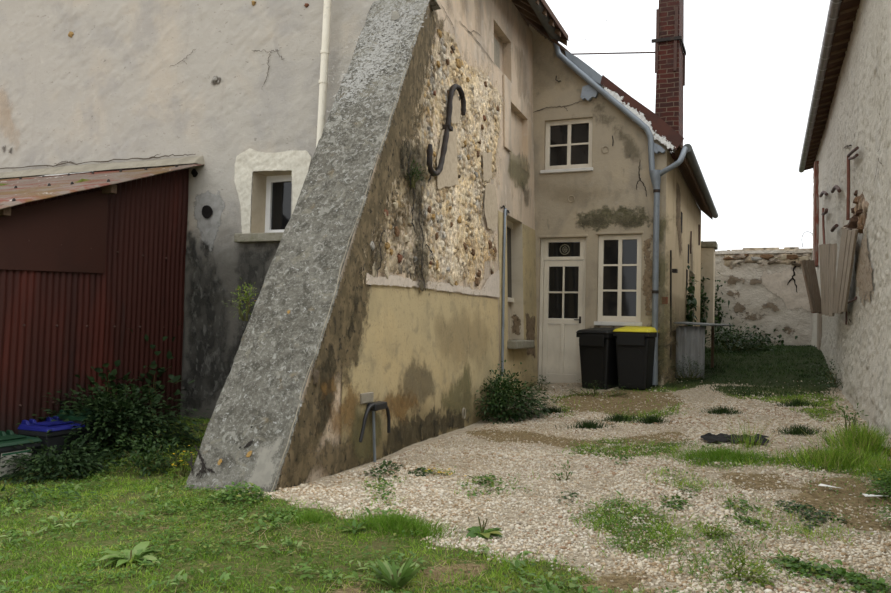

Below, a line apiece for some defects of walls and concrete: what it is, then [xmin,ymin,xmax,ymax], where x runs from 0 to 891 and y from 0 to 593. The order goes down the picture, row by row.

crack [0,154,195,169]
damp [275,5,469,491]
spalling [366,29,503,298]